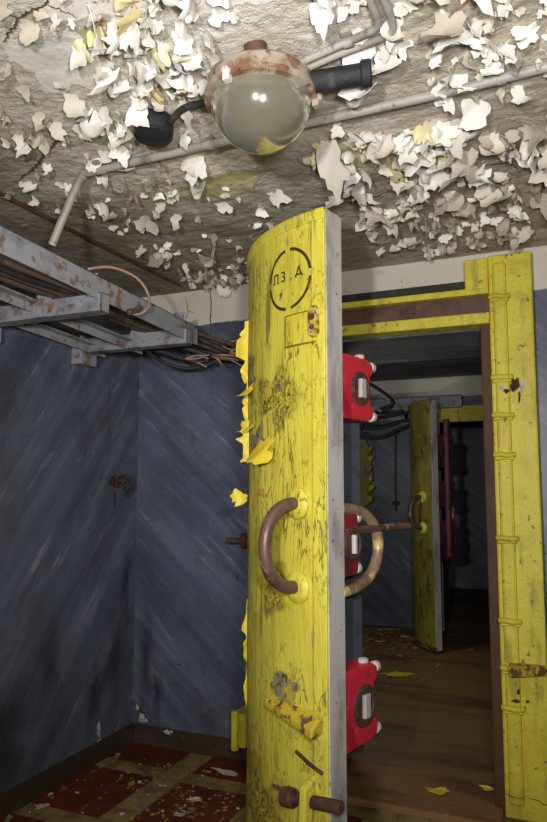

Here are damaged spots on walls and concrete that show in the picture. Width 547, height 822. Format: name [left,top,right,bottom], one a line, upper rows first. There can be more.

peeling [0,0,274,298]
peeling [266,189,292,209]
peeling [297,0,547,261]